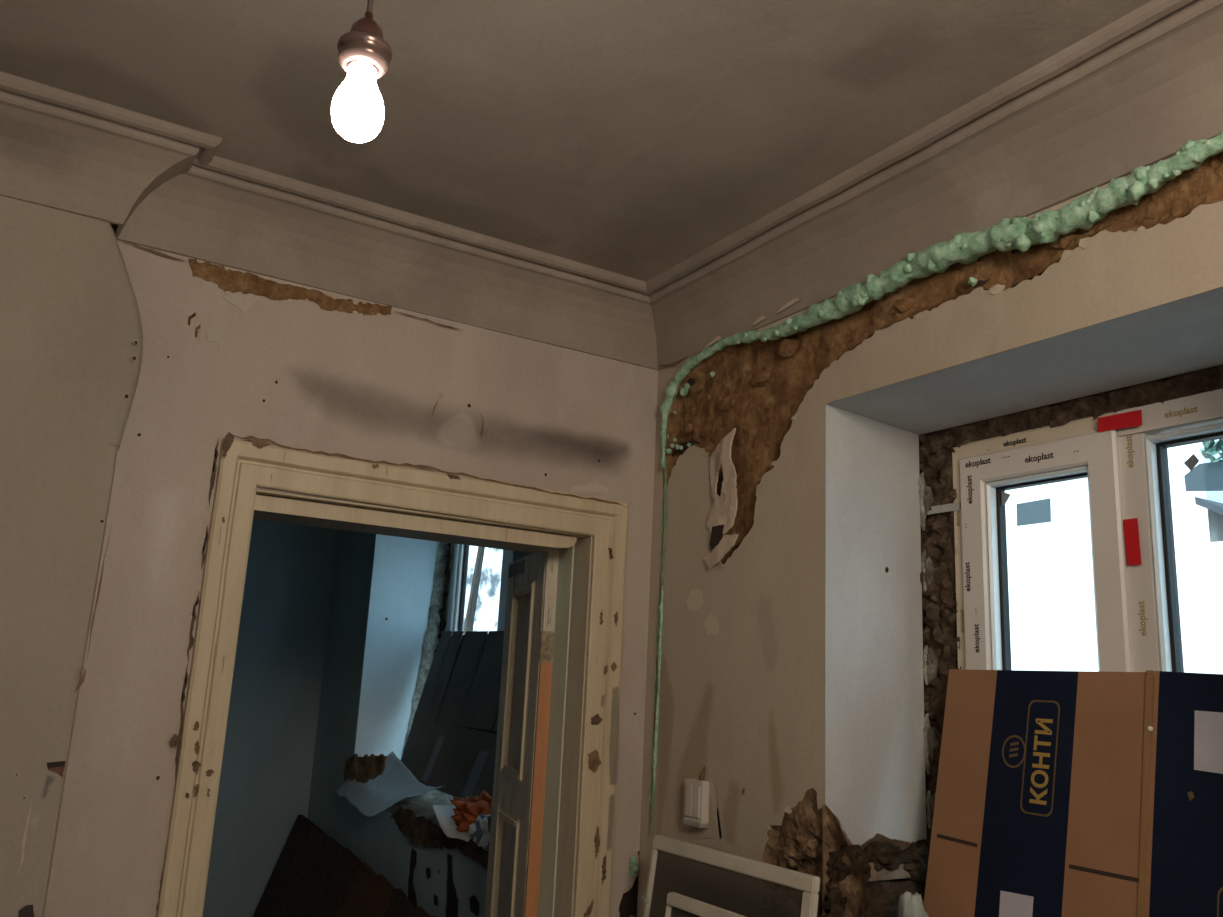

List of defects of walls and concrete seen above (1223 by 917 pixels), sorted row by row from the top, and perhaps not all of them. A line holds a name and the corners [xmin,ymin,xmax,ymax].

flaking render [188,259,392,317]
flaking render [666,152,1223,569]
flaking render [762,434,961,917]